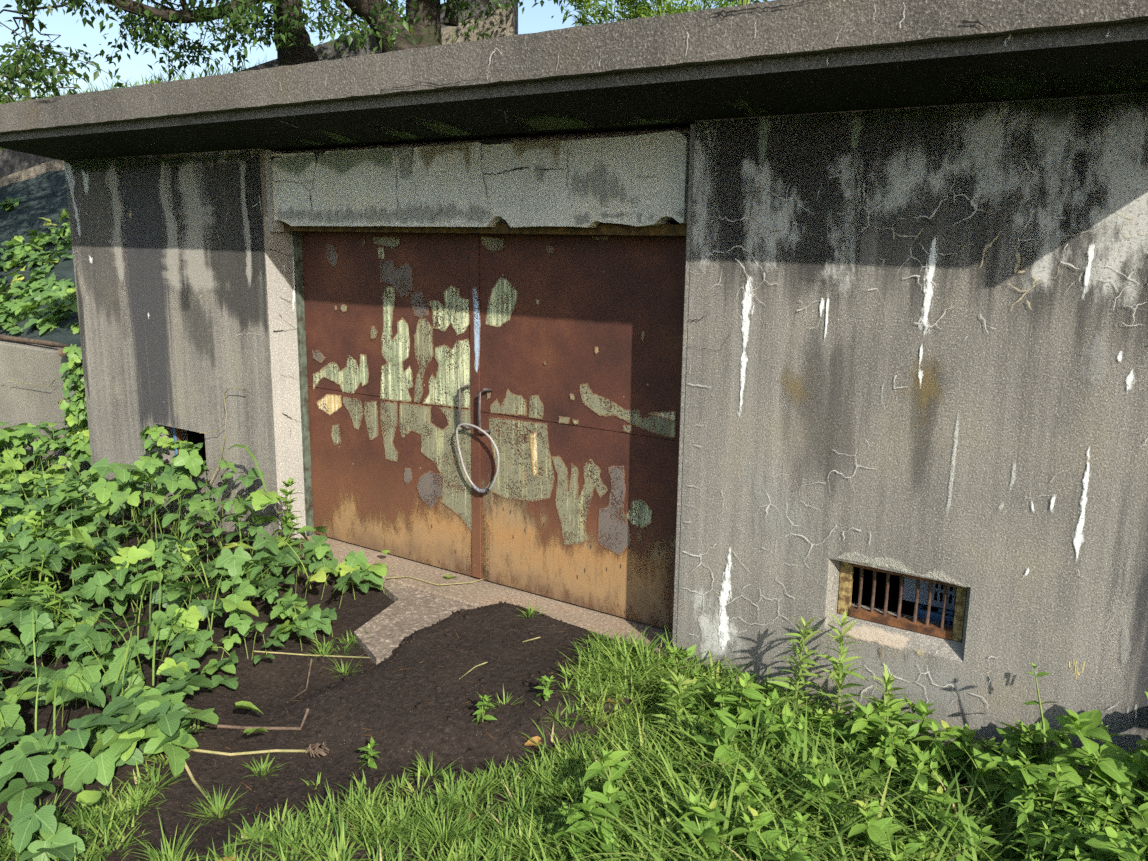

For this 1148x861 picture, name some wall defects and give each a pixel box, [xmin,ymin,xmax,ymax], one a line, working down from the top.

leakage [64,162,89,235]
leakage [76,273,89,392]
leakage [105,149,392,427]
crack [687,151,1148,388]
leakage [691,96,1148,416]
corrosion [320,482,676,630]
leakage [694,548,742,661]
crack [683,439,878,647]
leakage [946,420,959,509]
leakage [1073,448,1090,558]
crack [860,647,1000,720]